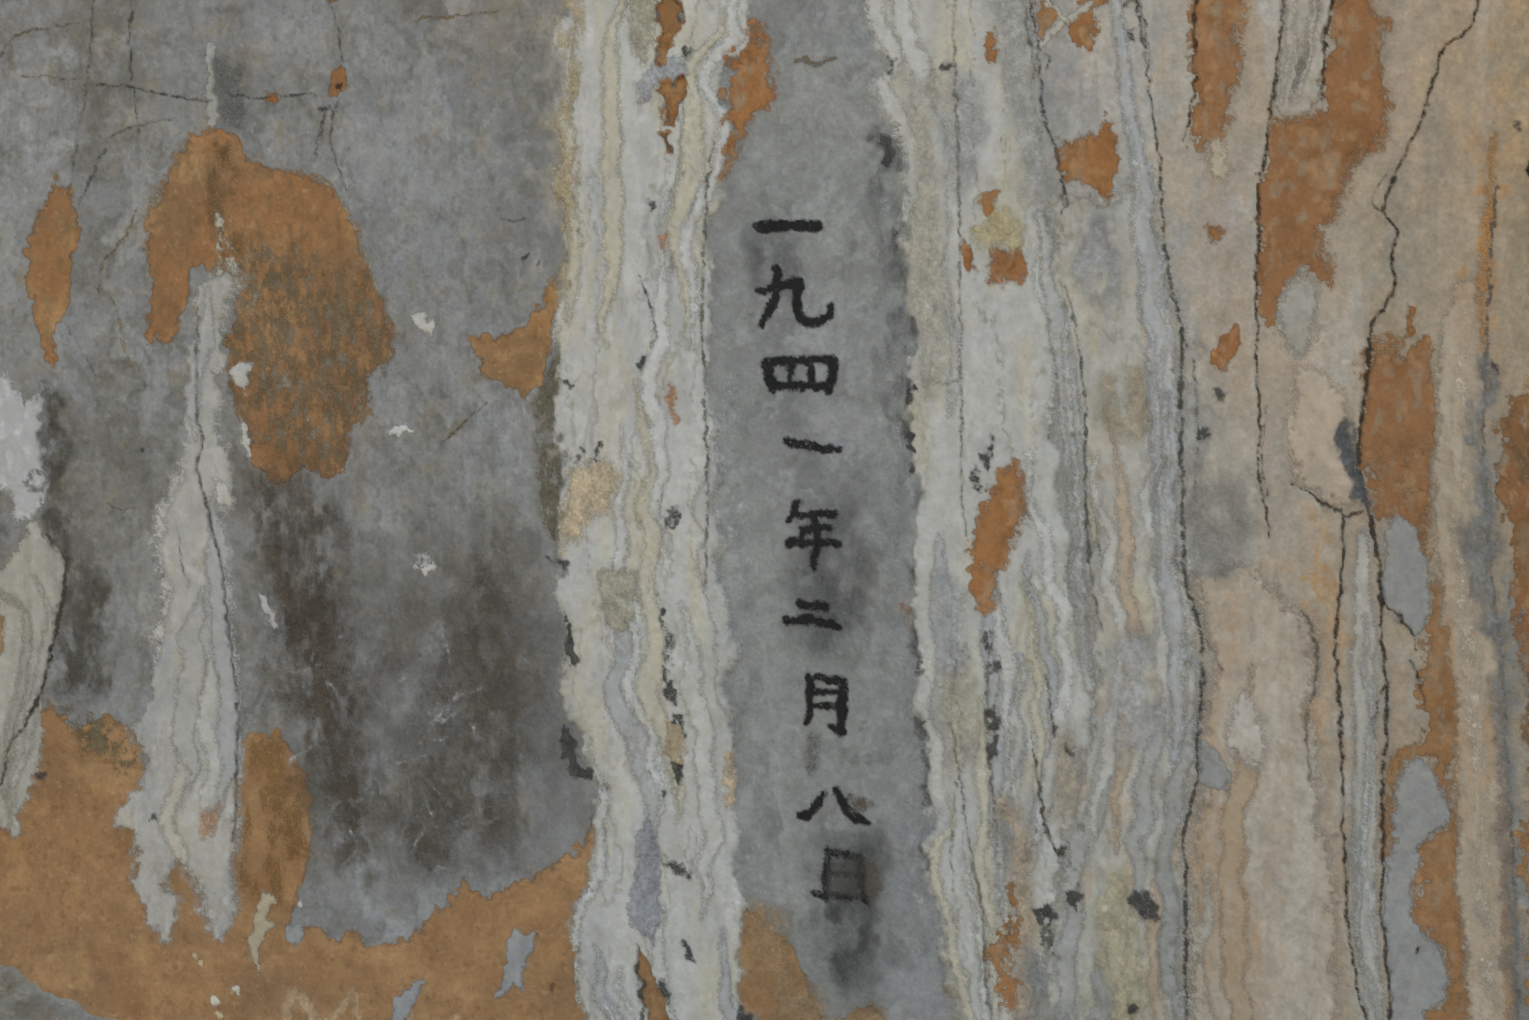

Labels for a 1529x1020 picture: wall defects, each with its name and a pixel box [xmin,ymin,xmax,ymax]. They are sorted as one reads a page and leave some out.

peeling [22,175,82,369]
peeling [143,126,395,485]
peeling [411,312,435,337]
peeling [469,276,561,398]
crack [1481,167,1529,455]
peeling [388,425,414,437]
crack [1254,0,1479,1020]
peeling [259,594,278,629]
peeling [1379,516,1432,636]
peeling [0,701,596,1020]
peeling [635,947,671,1020]
peeling [737,906,884,1020]